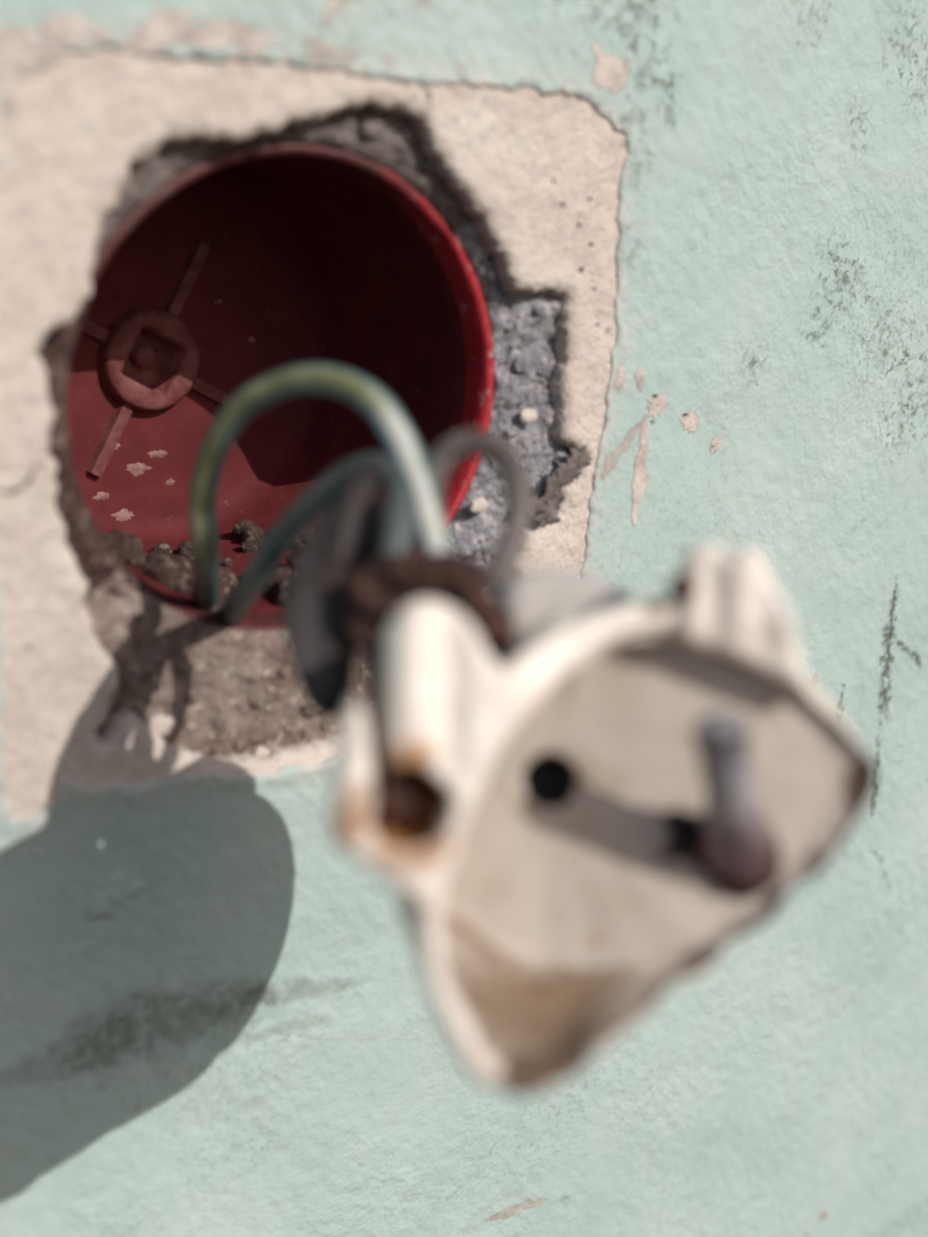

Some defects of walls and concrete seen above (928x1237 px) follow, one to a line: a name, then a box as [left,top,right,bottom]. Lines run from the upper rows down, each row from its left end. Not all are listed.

peeling [592,41,630,94]
spalling [95,106,668,527]
spalling [36,292,344,758]
spalling [447,457,505,570]
spalling [350,651,366,716]
crack [870,577,921,816]